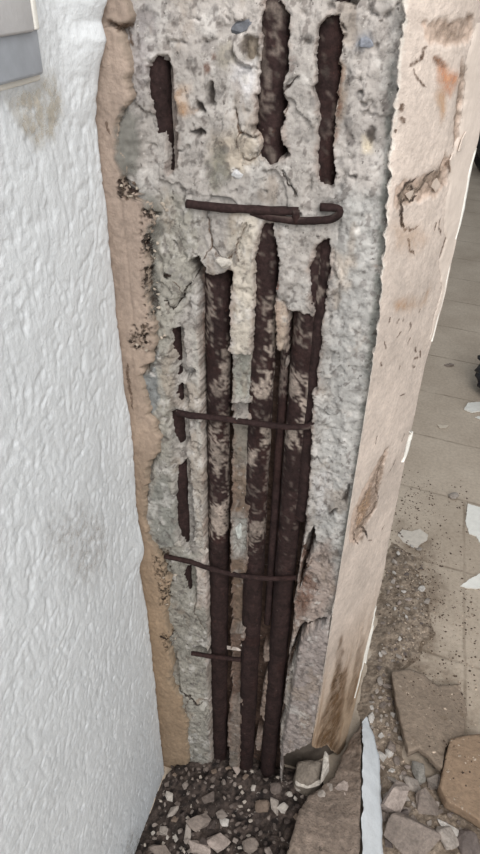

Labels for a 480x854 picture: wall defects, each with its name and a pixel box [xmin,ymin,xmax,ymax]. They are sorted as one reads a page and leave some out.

crack [397,170,441,231]
spalling [117,0,413,783]
flaking render [354,529,430,698]
leakage [318,671,346,751]